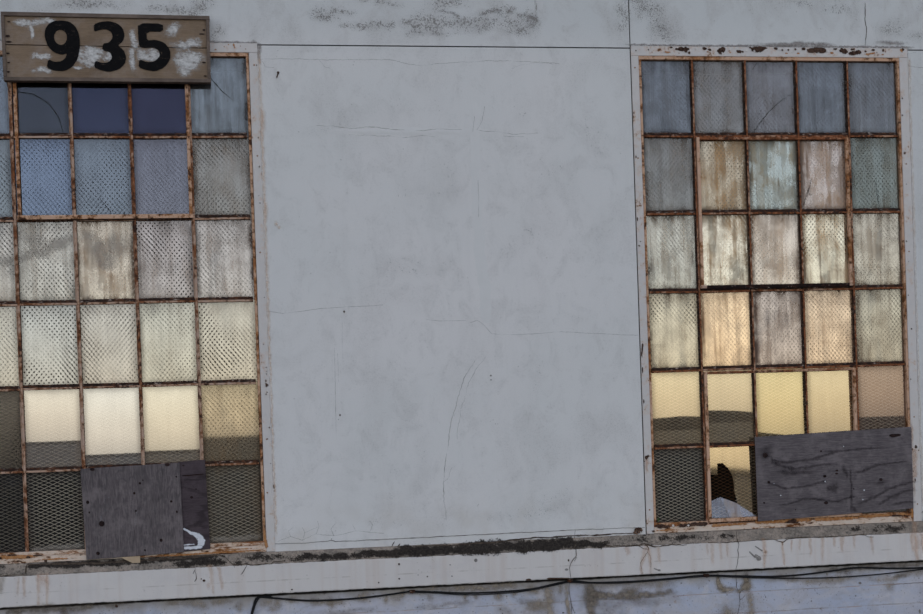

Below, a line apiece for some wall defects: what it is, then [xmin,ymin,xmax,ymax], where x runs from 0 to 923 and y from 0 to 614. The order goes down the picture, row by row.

leakage [27,536,610,569]
crack [223,527,681,611]
crack [708,531,868,610]
leakage [586,585,672,614]
leakage [717,577,753,614]